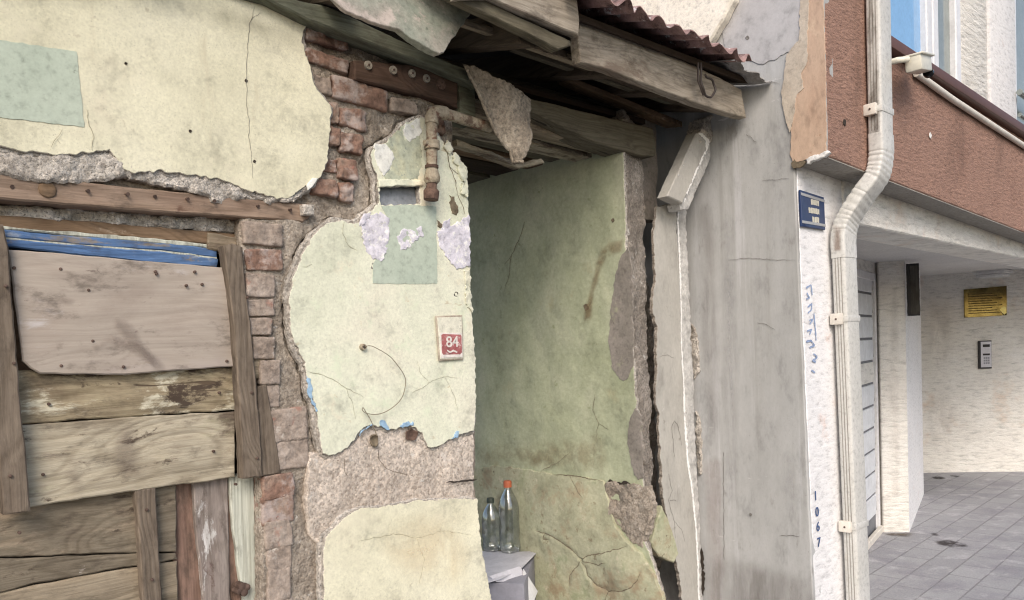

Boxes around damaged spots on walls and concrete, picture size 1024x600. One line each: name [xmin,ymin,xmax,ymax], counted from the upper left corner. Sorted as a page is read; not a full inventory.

peeling [722,0,831,169]
flaking render [0,28,476,600]
peeling [608,246,635,381]
crack [540,453,599,496]
flaking render [604,408,658,548]
crack [645,282,725,595]
crack [537,531,663,600]